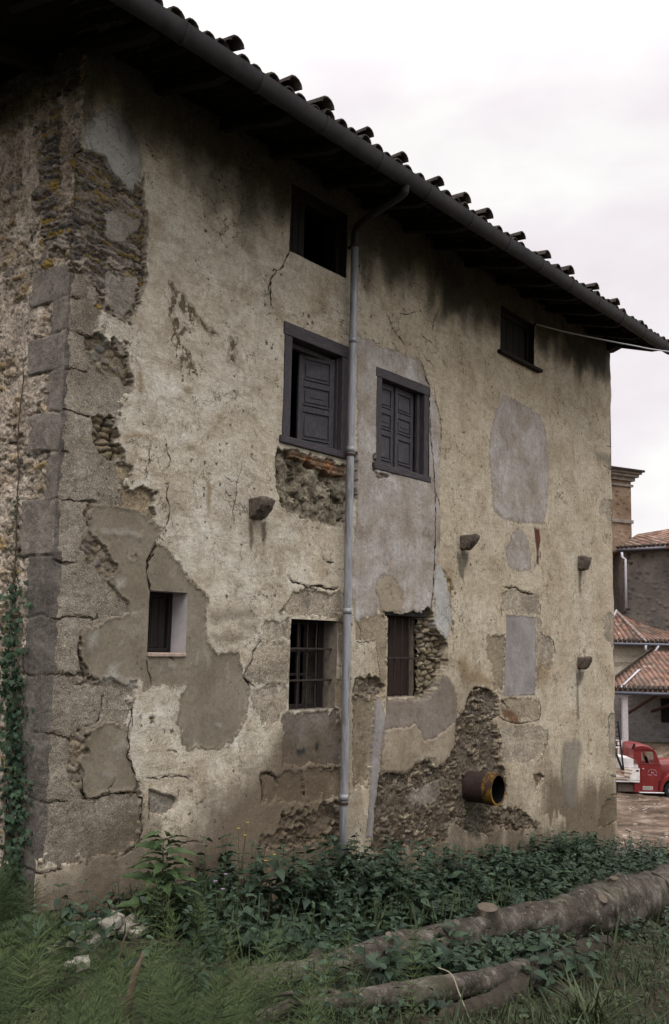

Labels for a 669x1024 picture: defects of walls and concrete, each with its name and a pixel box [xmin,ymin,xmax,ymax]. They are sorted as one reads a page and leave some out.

crack [268,253,289,305]
spalling [275,450,346,526]
spalling [43,273,174,868]
crack [290,557,338,590]